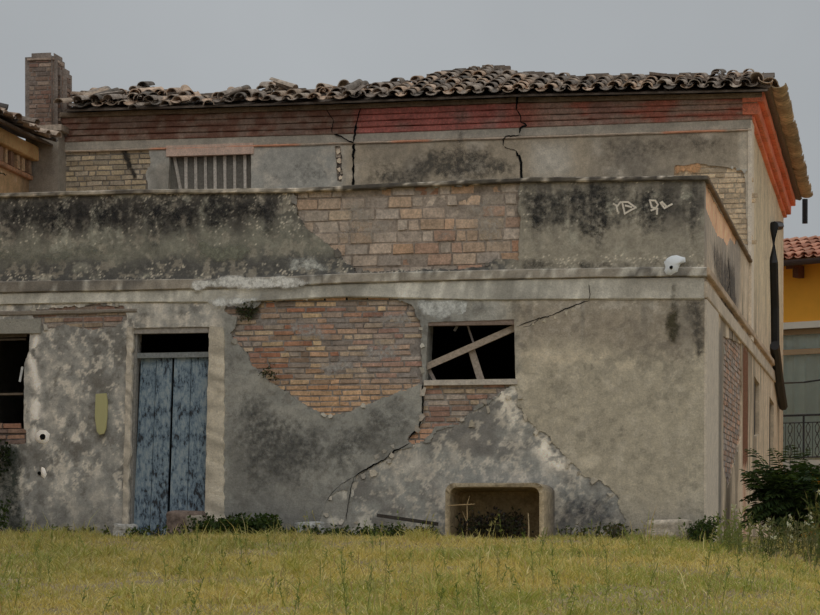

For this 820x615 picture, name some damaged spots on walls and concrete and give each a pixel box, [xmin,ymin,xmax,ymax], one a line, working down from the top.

flaking render [65,147,151,191]
crack [326,108,361,185]
flaking render [291,183,521,273]
crack [503,92,527,178]
damp [528,184,609,235]
flaking render [674,163,758,245]
crack [519,287,590,327]
damp [666,302,679,342]
damp [688,302,703,356]
flaking render [192,259,626,536]
crack [327,384,424,519]